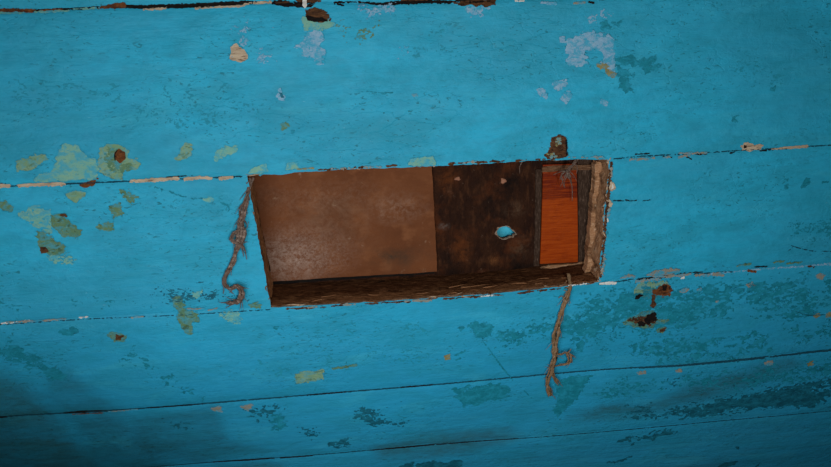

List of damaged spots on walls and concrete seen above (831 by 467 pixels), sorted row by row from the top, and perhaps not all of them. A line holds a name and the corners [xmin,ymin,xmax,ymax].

peeling [229,16,272,67]
peeling [536,9,662,104]
peeling [134,79,266,162]
peeling [741,142,763,152]
peeling [15,143,141,233]
peeling [0,199,83,265]
peeling [152,281,262,335]
peeling [286,299,432,312]
peeling [451,156,831,446]
peeling [271,322,366,384]